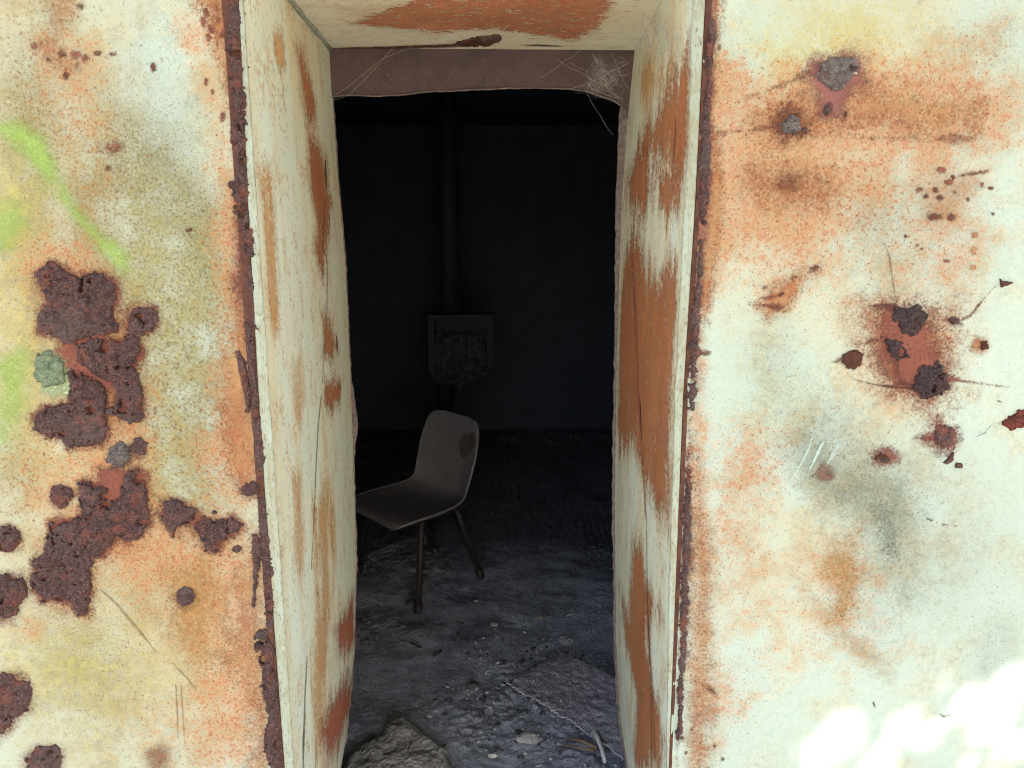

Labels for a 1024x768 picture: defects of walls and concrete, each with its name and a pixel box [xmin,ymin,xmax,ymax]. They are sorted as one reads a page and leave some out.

corrosion [352,0,613,42]
corrosion [751,50,988,151]
corrosion [299,48,333,278]
corrosion [928,213,955,221]
corrosion [916,167,994,201]
corrosion [0,0,285,768]
corrosion [323,313,338,360]
corrosion [324,377,341,416]
corrosion [618,0,725,768]
corrosion [755,265,822,320]
corrosion [836,291,989,468]
corrosion [297,490,357,768]